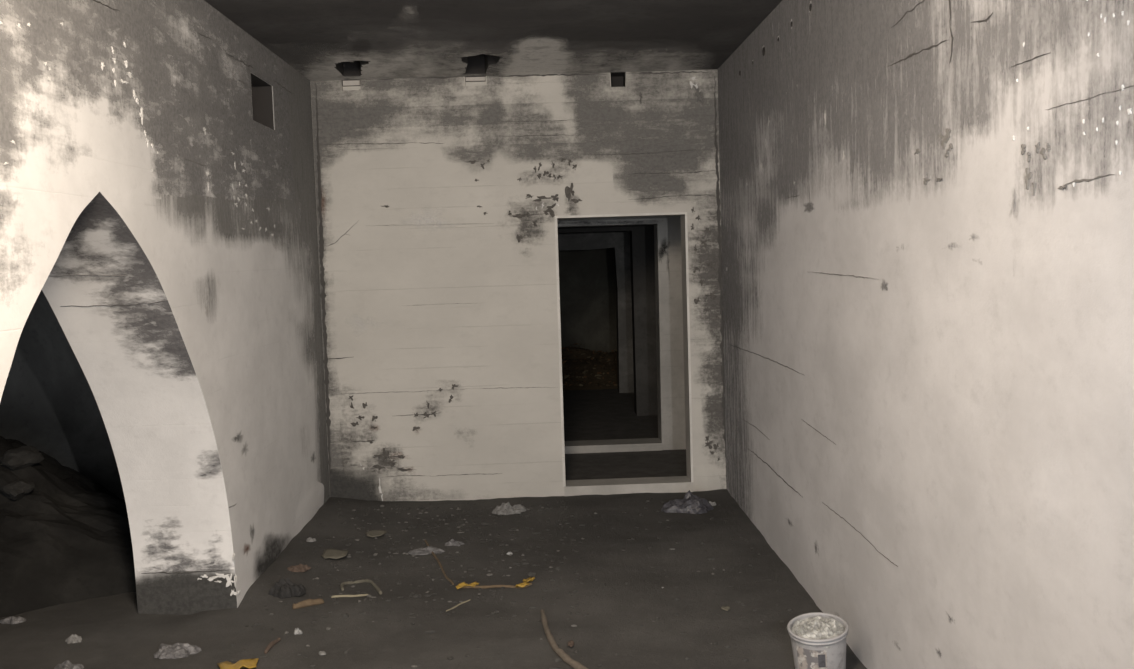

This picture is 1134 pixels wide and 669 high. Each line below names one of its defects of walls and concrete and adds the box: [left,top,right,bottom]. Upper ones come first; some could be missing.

leakage [0,60,41,168]
spalling [508,158,582,227]
leakage [850,147,943,191]
crack [1063,174,1114,186]
crack [1045,85,1134,110]
leakage [1055,92,1129,169]
leakage [54,233,151,353]
leakage [145,0,821,517]
spalling [349,396,412,501]